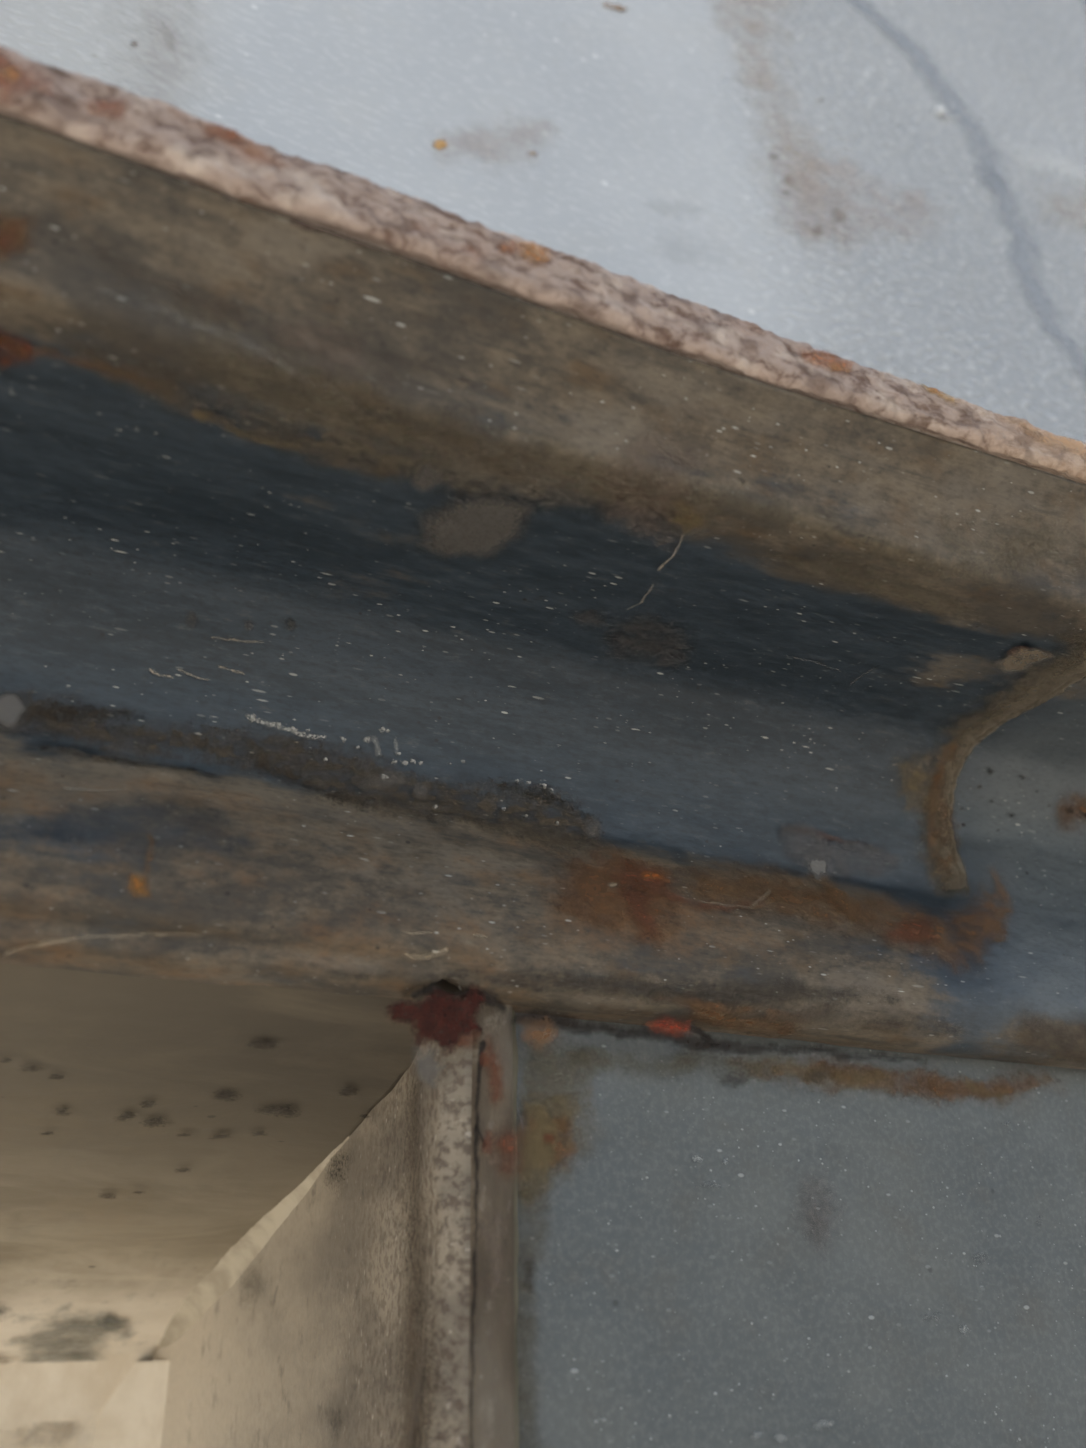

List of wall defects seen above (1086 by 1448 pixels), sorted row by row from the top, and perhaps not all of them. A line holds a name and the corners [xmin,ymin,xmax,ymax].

rust [209,124,240,141]
damp [247,715,423,779]
damp [12,1317,125,1362]